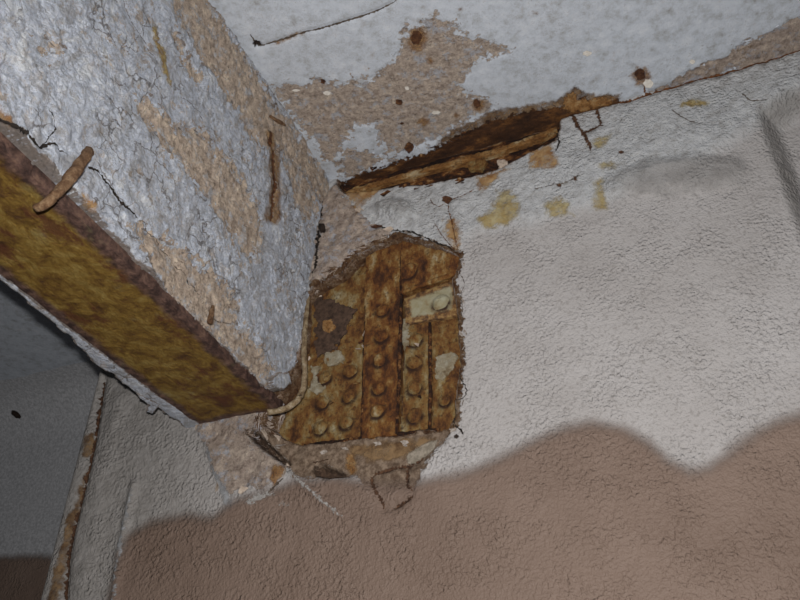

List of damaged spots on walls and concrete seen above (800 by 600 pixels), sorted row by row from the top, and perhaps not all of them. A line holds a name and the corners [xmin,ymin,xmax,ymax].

crack [250,0,396,47]
corrosion [409,29,426,51]
crack [0,110,64,152]
corrosion [265,131,281,224]
corrosion [339,87,619,209]
crack [556,50,800,151]
peeling [124,0,516,509]
corrosion [446,219,461,248]